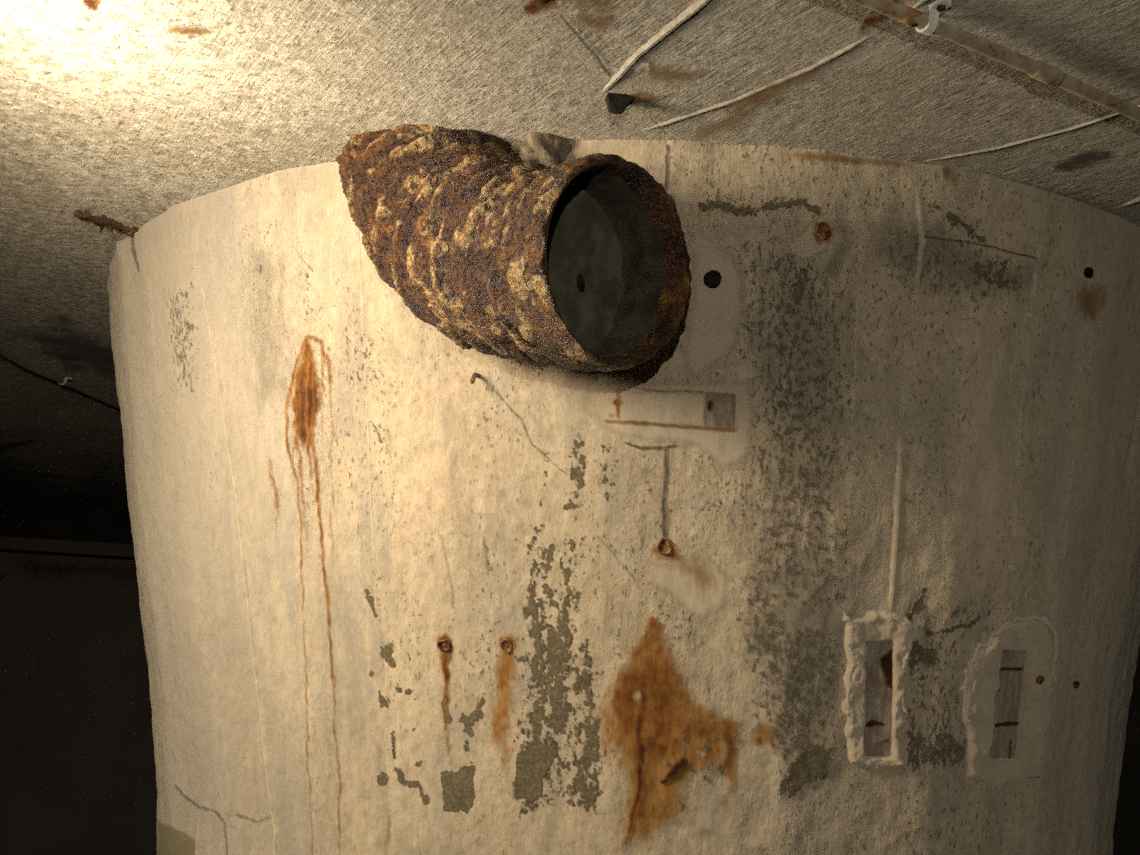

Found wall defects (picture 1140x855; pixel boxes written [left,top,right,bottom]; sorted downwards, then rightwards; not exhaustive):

corrosion [860,0,922,34]
corrosion [74,210,140,237]
corrosion [285,336,335,712]
corrosion [438,634,452,749]
corrosion [492,636,515,758]
peeling [512,524,609,817]
corrosion [602,616,775,848]